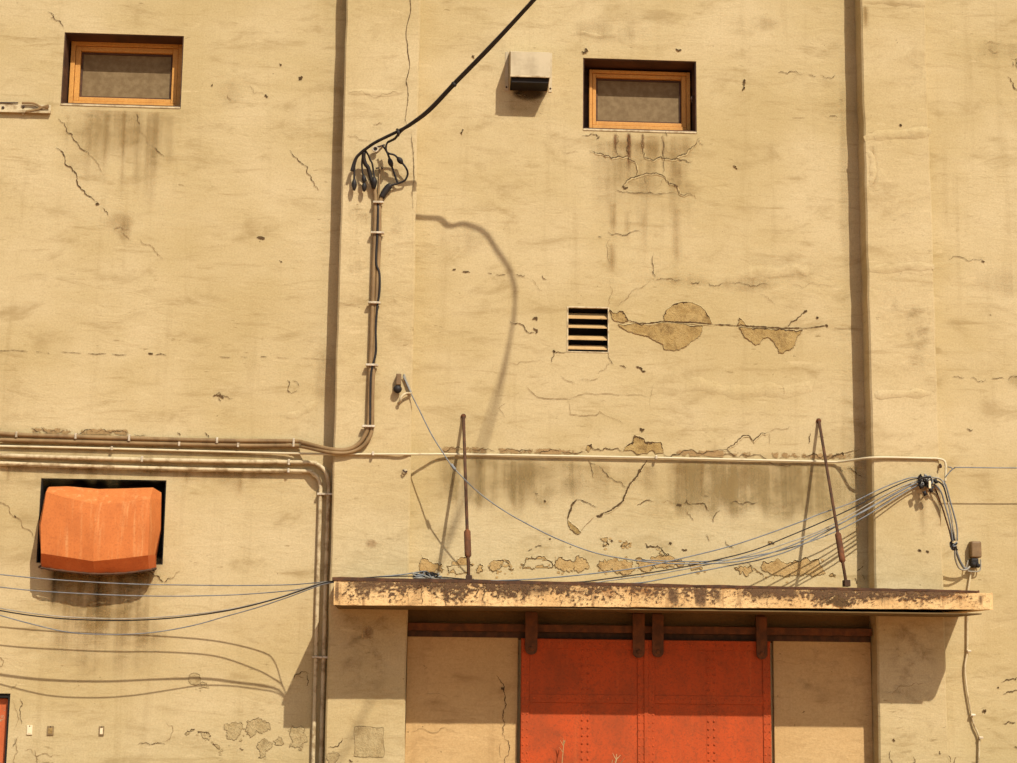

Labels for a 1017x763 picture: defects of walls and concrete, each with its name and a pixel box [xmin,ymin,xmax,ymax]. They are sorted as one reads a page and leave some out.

crack [349,0,414,199]
crack [57,122,161,257]
crack [564,132,701,199]
spalling [609,301,712,351]
spalling [737,318,803,354]
spalling [623,427,664,455]
damp [676,462,770,512]
damp [781,464,824,508]
crack [444,428,862,606]
damp [91,572,146,629]
peeling [339,536,973,608]
peeling [185,717,308,759]